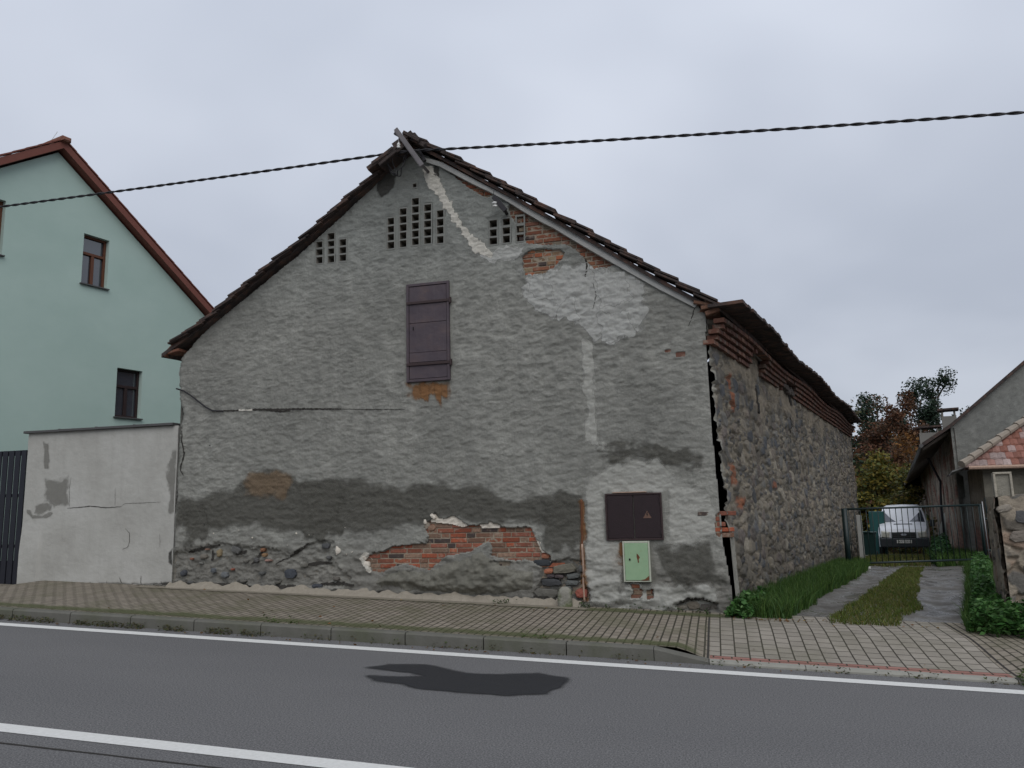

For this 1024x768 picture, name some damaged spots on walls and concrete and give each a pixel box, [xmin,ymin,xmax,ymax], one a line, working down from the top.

flaking render [506,204,649,345]
crack [73,427,185,508]
damp [167,451,581,552]
spalling [153,514,590,602]